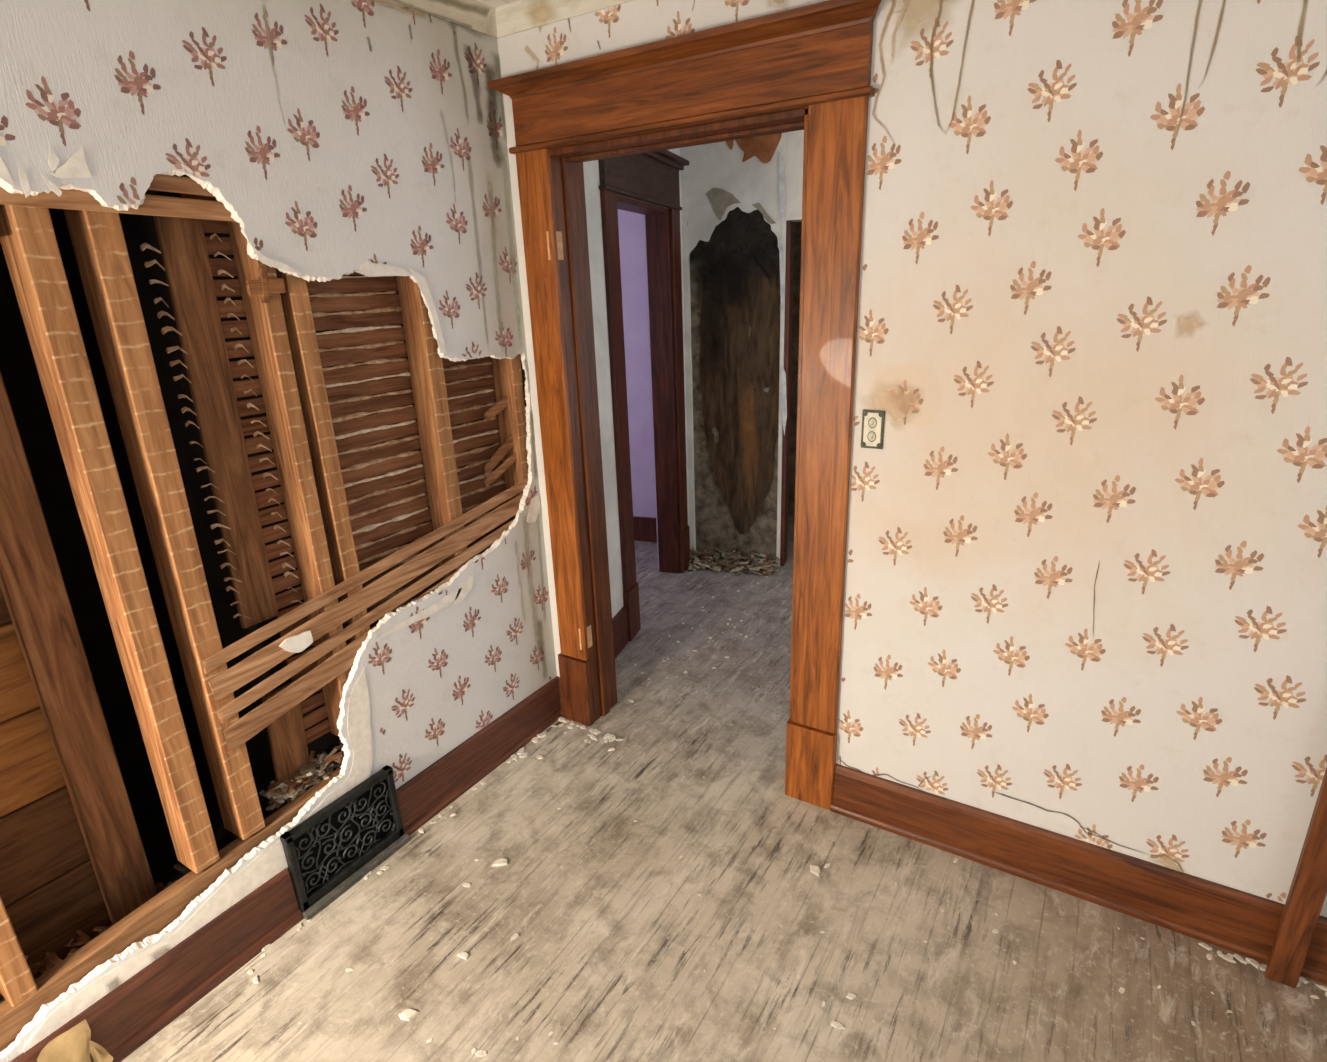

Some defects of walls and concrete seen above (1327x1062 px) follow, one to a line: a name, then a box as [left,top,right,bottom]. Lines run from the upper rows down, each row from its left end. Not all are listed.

leakage [453,25,515,264]
leakage [880,0,895,75]
leakage [911,0,974,126]
leakage [1297,0,1308,59]
spalling [0,146,238,886]
spalling [119,213,307,669]
flaking render [343,260,501,507]
flaking render [687,133,795,563]
spalling [245,727,289,819]
spalling [233,645,317,718]
flaking render [303,668,372,818]
flaking render [23,840,288,1062]